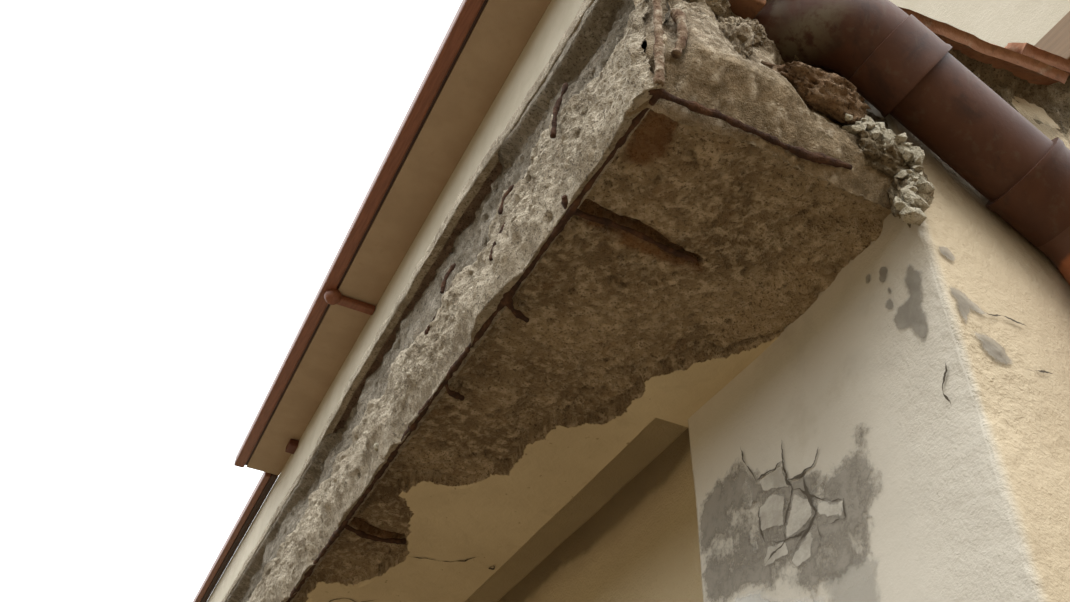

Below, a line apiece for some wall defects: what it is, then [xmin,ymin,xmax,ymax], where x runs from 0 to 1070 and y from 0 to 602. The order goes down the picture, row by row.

rust [626,110,677,163]
rust [579,199,699,269]
spalling [247,0,935,602]
crack [740,444,846,567]